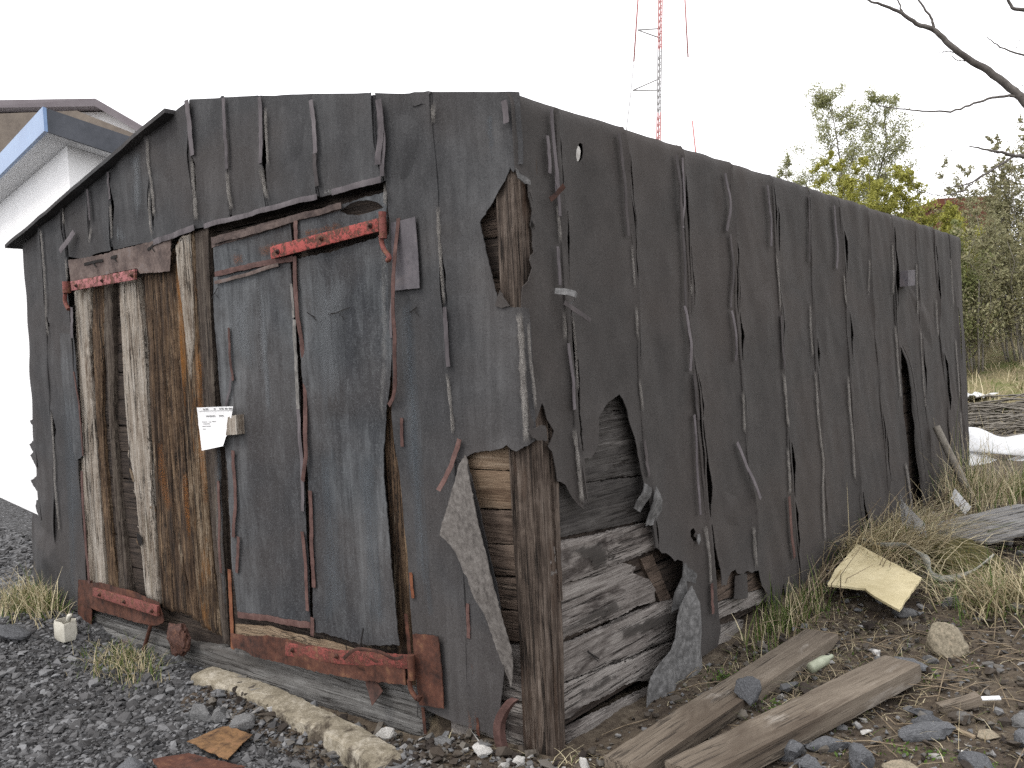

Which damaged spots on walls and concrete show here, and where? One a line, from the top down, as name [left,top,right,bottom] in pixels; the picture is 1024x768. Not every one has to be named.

peeling [515,168,533,201]
peeling [440,455,513,688]
peeling [634,483,662,526]
peeling [646,563,703,707]